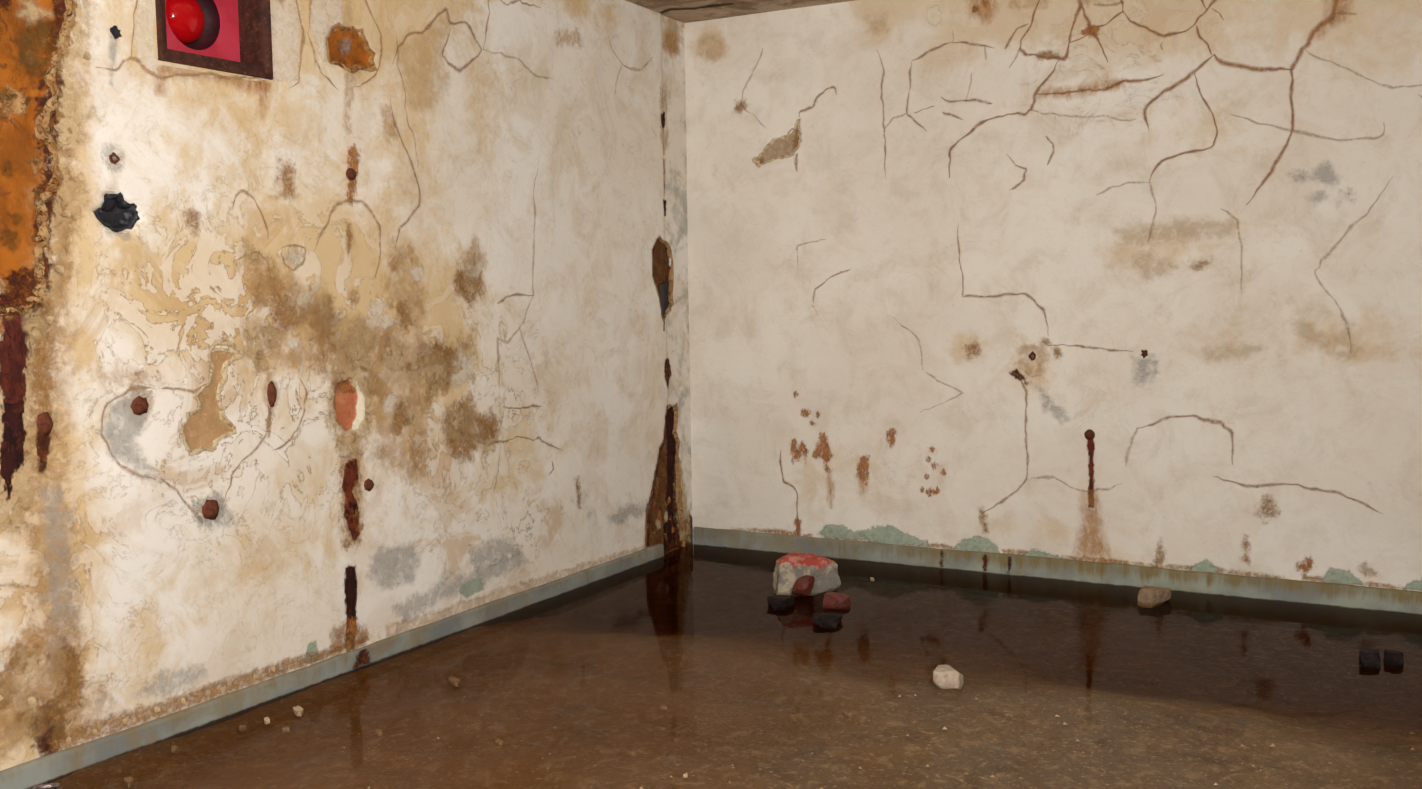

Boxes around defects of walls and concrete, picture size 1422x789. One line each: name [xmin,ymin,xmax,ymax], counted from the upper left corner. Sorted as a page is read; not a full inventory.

flaking render [0,0,343,353]
rust [326,23,377,73]
crack [877,0,1346,205]
rust [0,292,51,532]
flaking render [101,339,243,523]
leakage [243,292,339,370]
leakage [348,298,498,460]
flaking render [652,236,674,331]
crack [957,231,1133,352]
crack [1141,415,1378,512]
leakage [27,653,86,721]
rust [26,566,370,756]